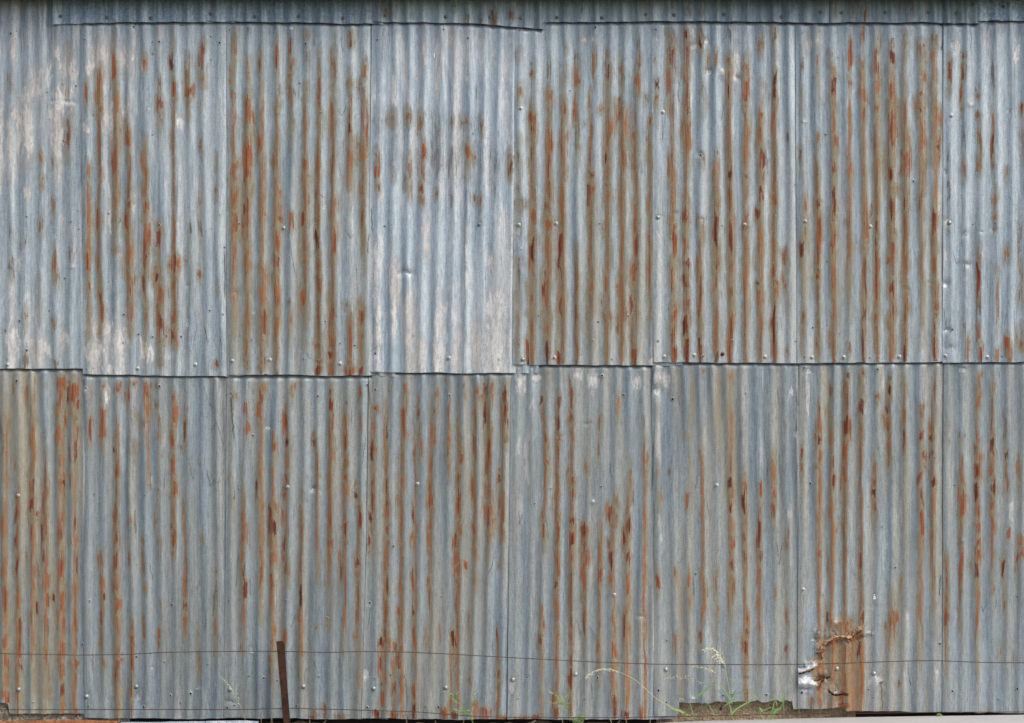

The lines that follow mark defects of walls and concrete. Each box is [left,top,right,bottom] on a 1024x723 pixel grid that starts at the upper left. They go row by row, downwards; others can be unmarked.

corrosion [0,354,204,718]
corrosion [85,41,205,366]
corrosion [198,34,508,719]
corrosion [473,377,671,719]
corrosion [507,7,1024,711]